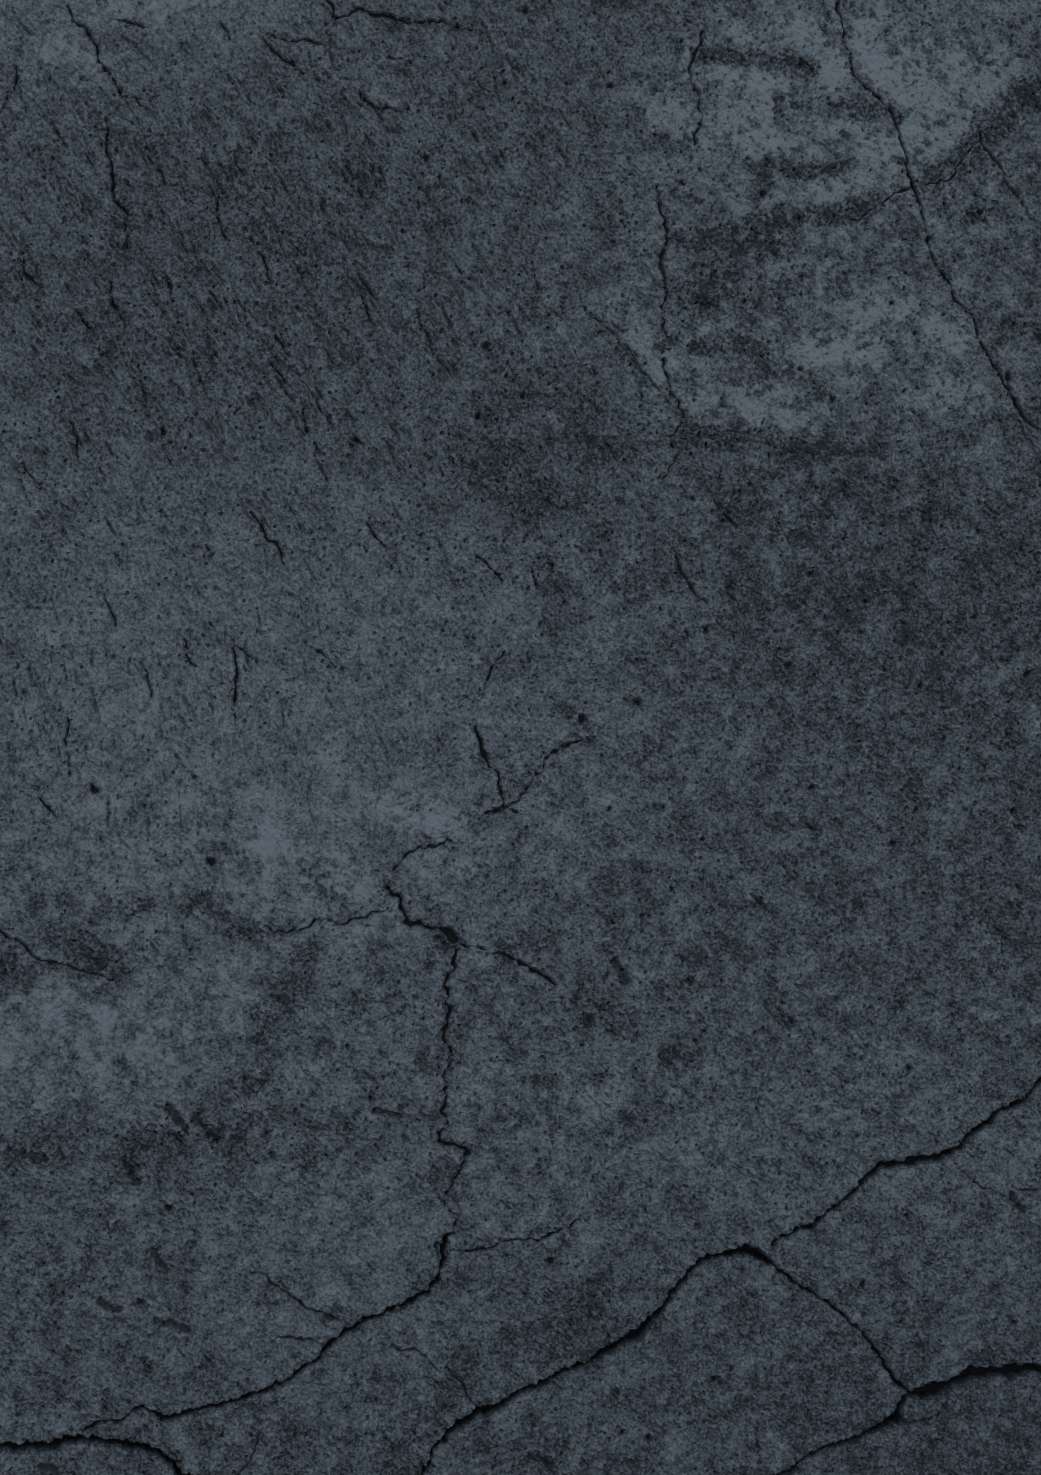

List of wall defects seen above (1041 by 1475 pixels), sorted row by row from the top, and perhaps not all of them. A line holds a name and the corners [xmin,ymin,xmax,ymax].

crack [834,0,1041,465]
crack [0,718,1041,1475]